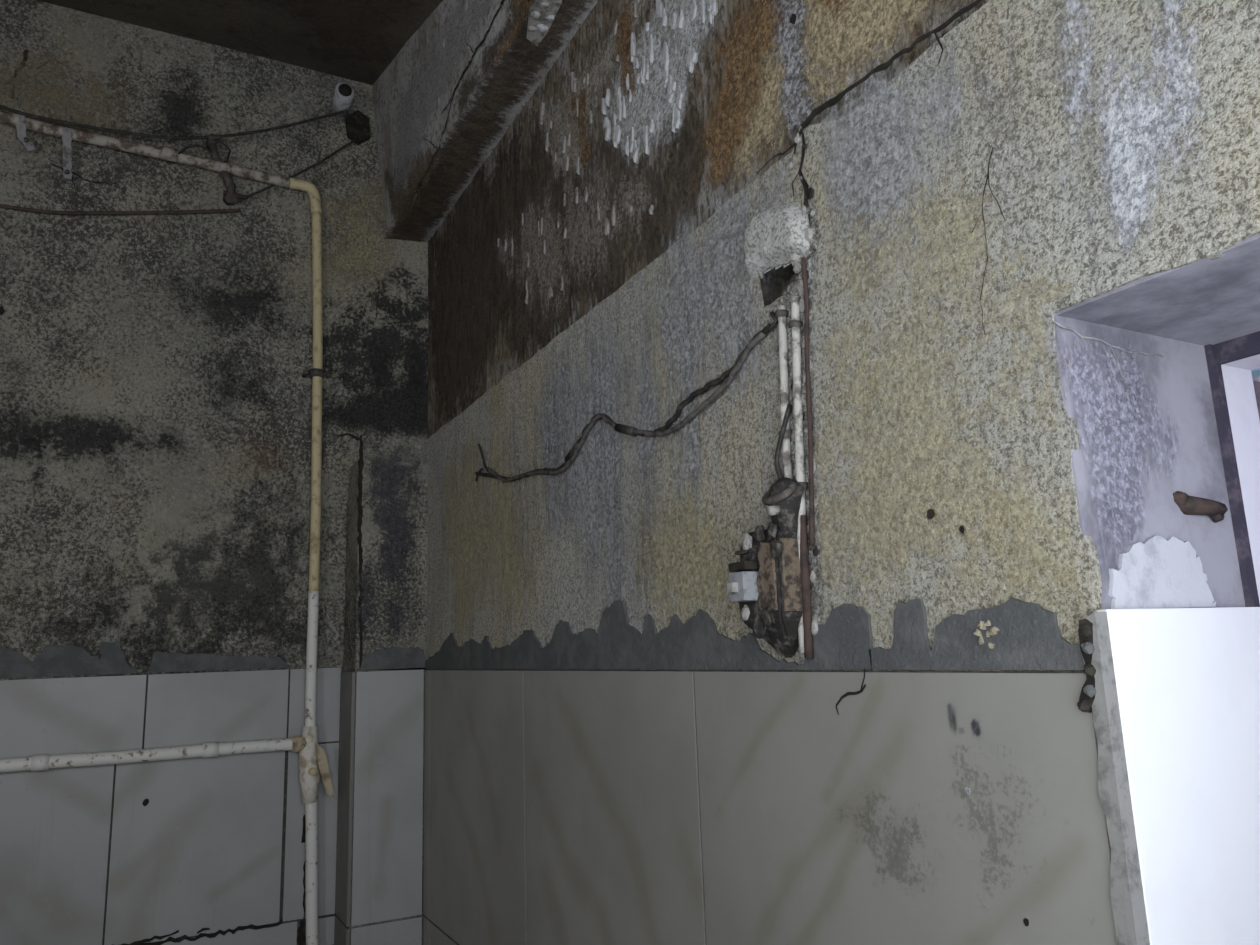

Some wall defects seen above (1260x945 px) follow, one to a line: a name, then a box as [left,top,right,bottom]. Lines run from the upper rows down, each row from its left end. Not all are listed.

crack [756,0,981,252]
damp [165,269,282,336]
damp [293,0,759,640]
flaking render [759,161,823,636]
damp [0,406,186,488]
peeling [973,620,1000,649]
spalling [1077,619,1097,713]